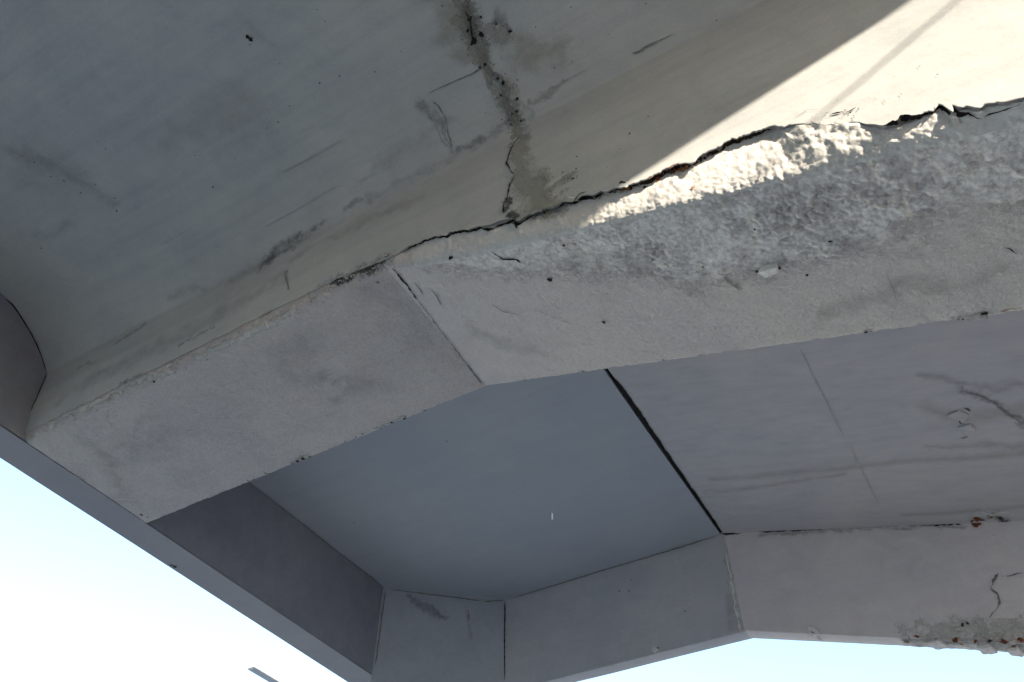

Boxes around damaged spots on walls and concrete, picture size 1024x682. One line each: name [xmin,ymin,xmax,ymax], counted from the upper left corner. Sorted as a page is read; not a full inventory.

spalling [441,0,529,135]
crack [883,103,1021,126]
crack [389,11,771,384]
spalling [411,101,1024,295]
crack [964,393,1023,424]
crack [990,573,1019,617]
spalling [898,615,1024,657]